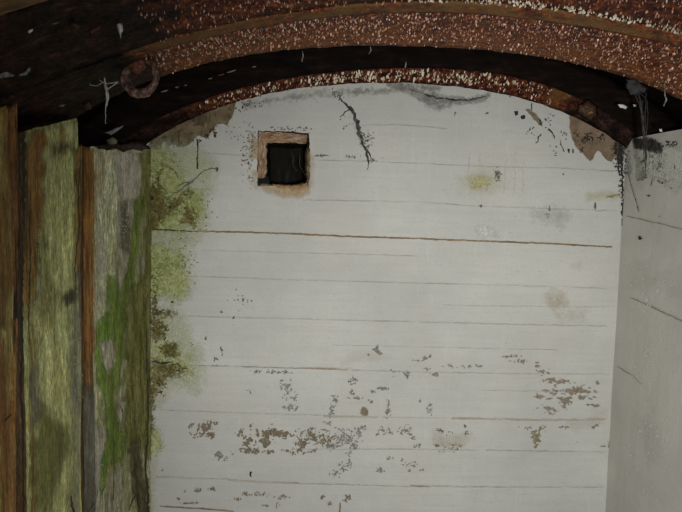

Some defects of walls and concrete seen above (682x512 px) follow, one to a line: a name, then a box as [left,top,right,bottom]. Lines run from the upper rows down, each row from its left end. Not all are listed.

peeling [148,82,279,150]
crack [338,94,375,170]
peeling [301,68,552,127]
peeling [569,115,618,162]
damp [607,137,682,218]
peeling [347,375,389,416]
peeling [533,362,600,415]
peeling [214,395,367,478]